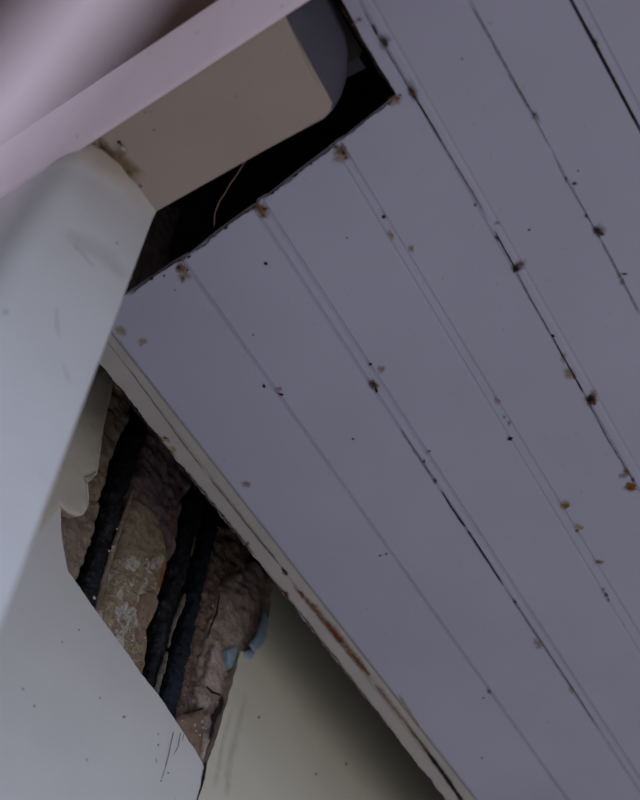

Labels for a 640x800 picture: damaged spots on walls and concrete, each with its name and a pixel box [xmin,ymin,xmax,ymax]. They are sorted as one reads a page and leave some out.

peeling [31,365,130,580]
flaking render [92,429,192,674]
flaking render [154,572,189,695]
flaking render [175,525,268,763]
corrosion [284,591,369,675]